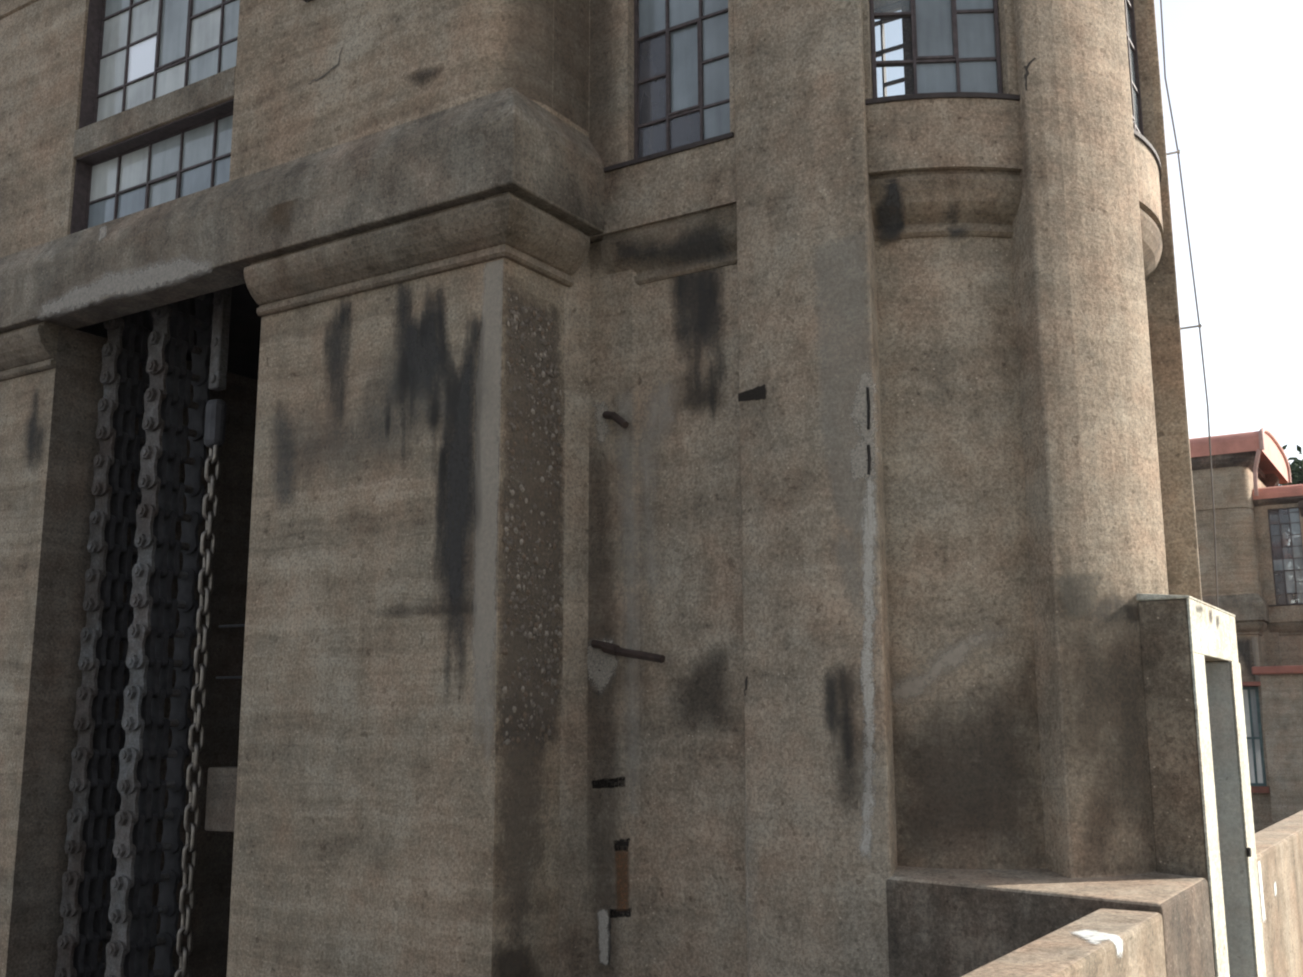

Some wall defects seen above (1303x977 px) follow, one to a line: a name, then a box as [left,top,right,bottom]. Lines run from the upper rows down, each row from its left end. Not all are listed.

water stain [877,181,903,242]
water stain [620,232,726,349]
water stain [399,286,476,661]